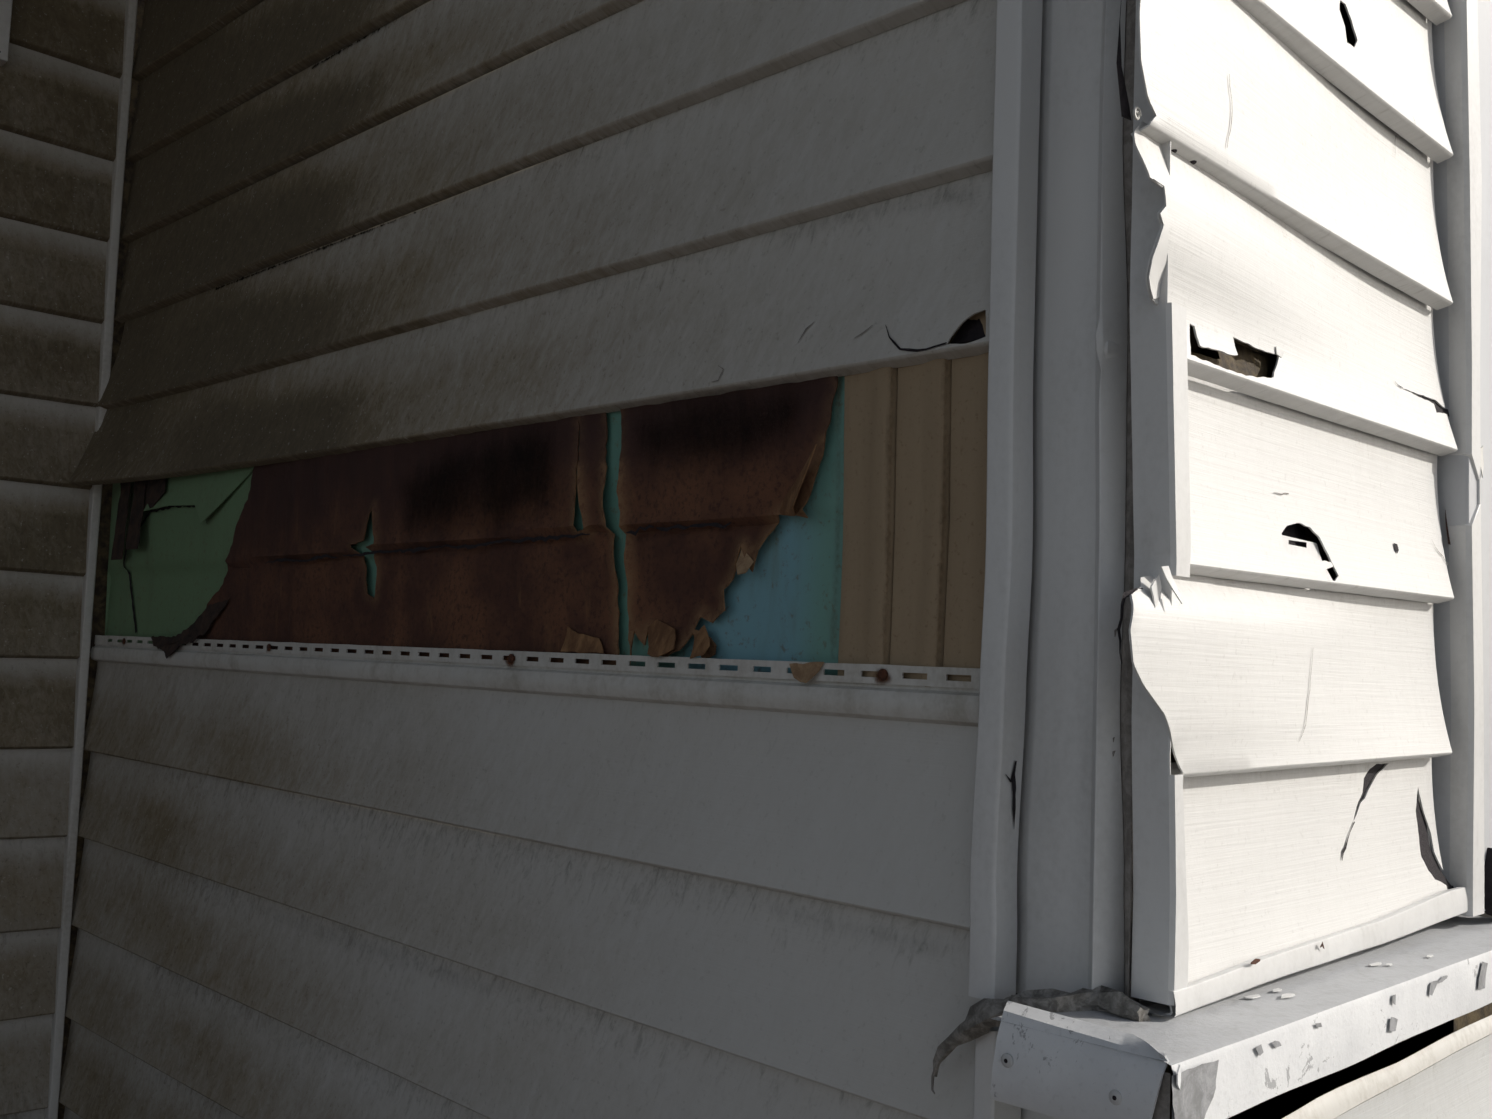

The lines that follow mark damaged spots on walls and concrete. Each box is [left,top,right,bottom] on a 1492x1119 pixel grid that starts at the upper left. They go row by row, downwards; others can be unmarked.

peeling [1234,340,1284,358]
crack [1399,385,1450,417]
crack [1342,764,1384,860]
crack [1416,795,1454,890]
peeling [1243,988,1295,999]
peeling [1429,975,1448,995]
peeling [1478,962,1488,989]
peeling [1390,994,1398,1031]